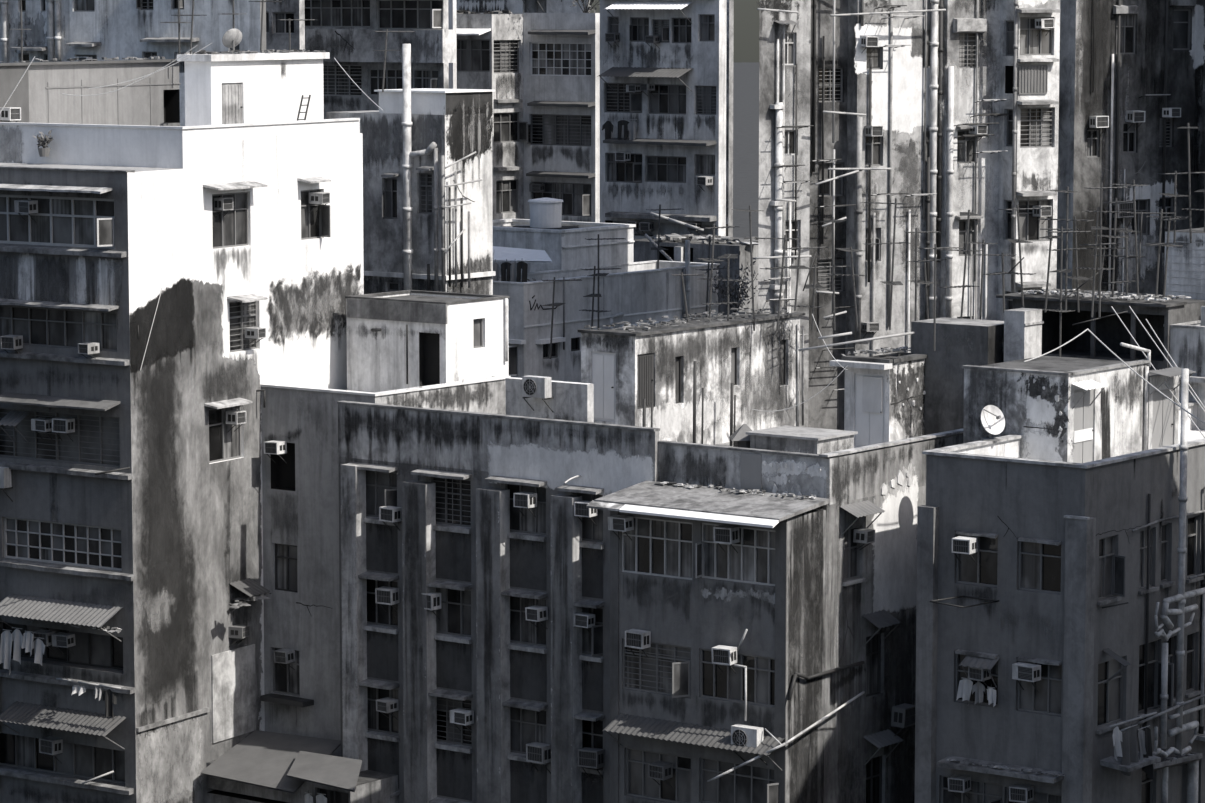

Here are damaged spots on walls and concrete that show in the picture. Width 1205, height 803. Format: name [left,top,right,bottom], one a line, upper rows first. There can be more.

leakage [324,76,521,186]
leakage [532,147,589,170]
peeling [854,23,996,135]
leakage [1081,0,1204,176]
peeling [1189,4,1205,69]
leakage [216,250,247,274]
leakage [267,253,494,344]
leakage [338,381,634,464]
peeling [1017,373,1074,462]
leakage [0,253,220,738]
peeling [762,451,827,505]